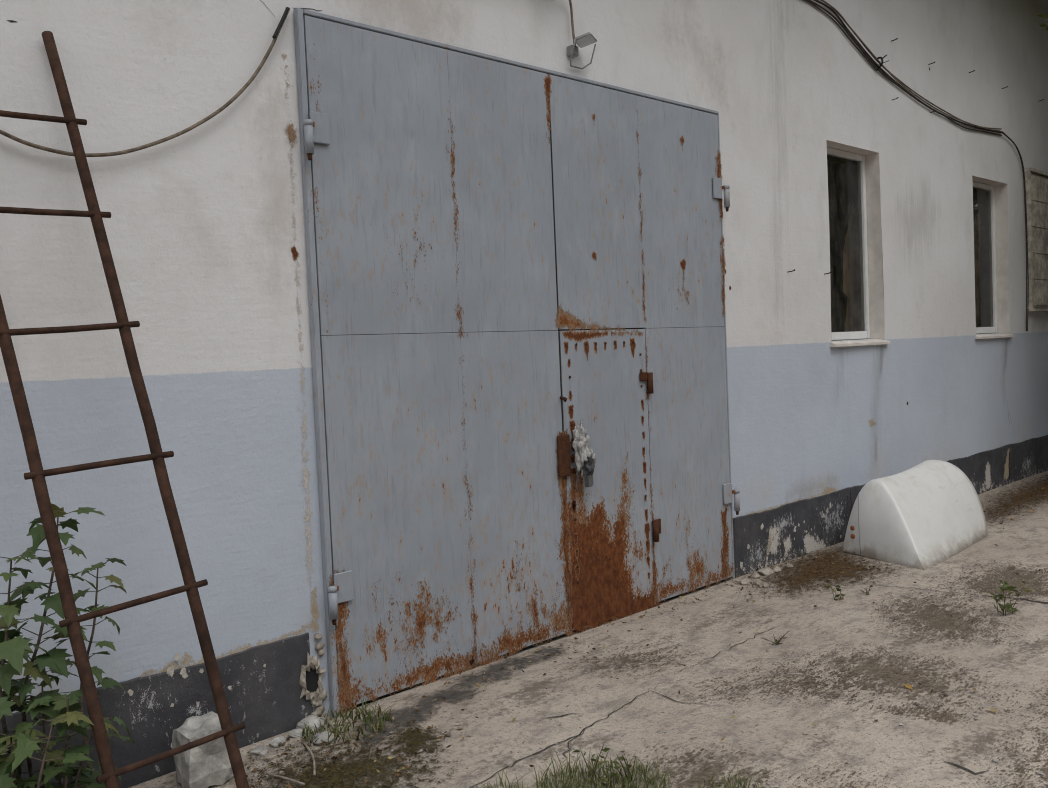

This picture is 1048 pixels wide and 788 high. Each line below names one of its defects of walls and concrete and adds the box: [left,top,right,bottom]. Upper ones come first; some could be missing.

rust [544,74,552,143]
rust [447,116,460,283]
rust [556,131,648,372]
rust [715,151,726,315]
peeling [110,256,327,737]
rust [330,387,735,715]
peeling [733,486,848,573]
peeling [971,448,1045,493]